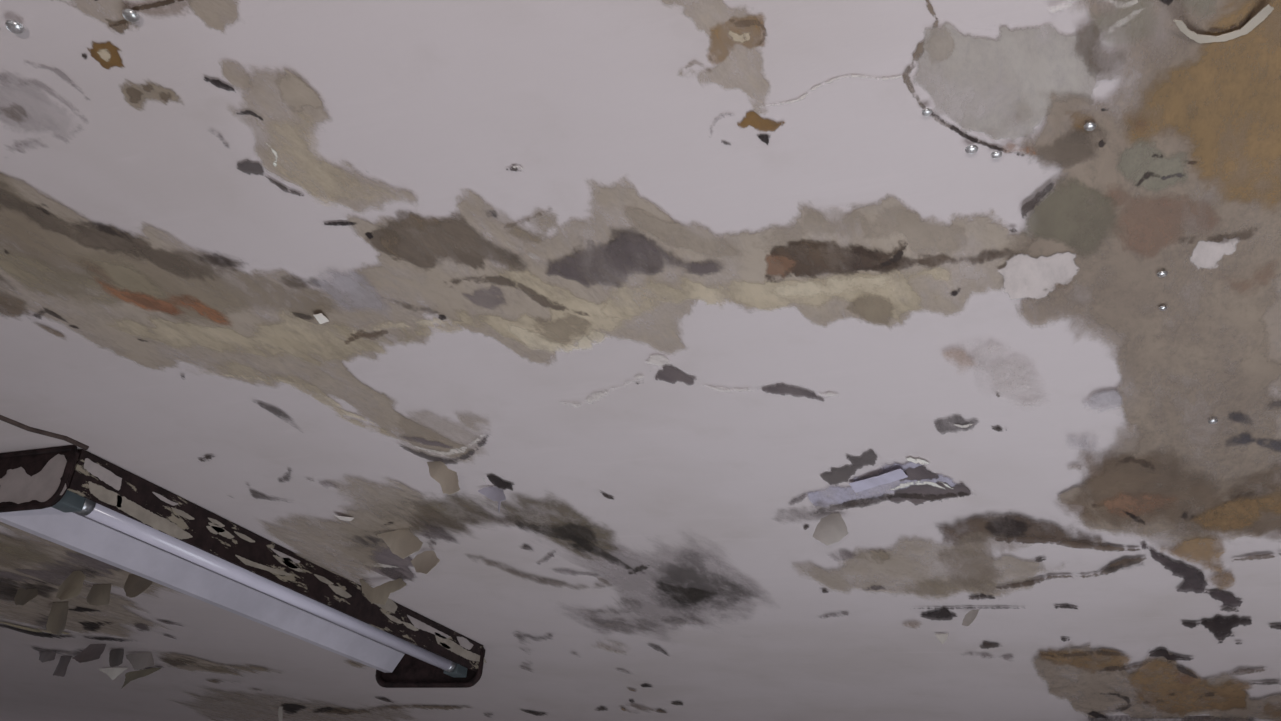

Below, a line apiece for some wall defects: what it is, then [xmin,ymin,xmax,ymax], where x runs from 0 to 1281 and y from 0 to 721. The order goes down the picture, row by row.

crack [110,0,238,31]
peeling [1160,0,1274,43]
crack [902,0,1024,156]
peeling [204,61,416,212]
peeling [762,384,834,401]
peeling [0,522,268,689]
peeling [267,479,455,605]
damp [374,497,753,633]
peeling [792,450,971,545]
damp [800,540,1045,644]
damp [970,642,1013,660]
damp [1034,638,1281,721]